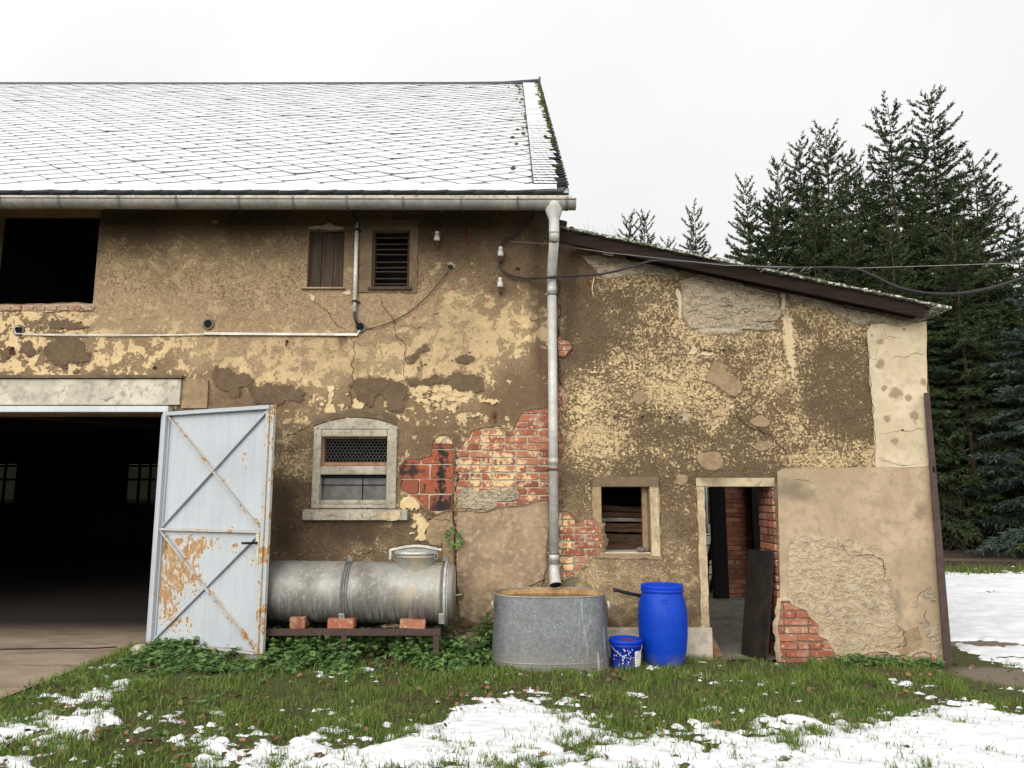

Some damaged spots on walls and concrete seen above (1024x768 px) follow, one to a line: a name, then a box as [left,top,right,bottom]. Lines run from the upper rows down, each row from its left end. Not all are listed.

peeling [0,302,97,374]
crack [314,300,355,407]
crack [380,290,426,393]
spalling [208,336,624,582]
flaking render [772,533,944,665]